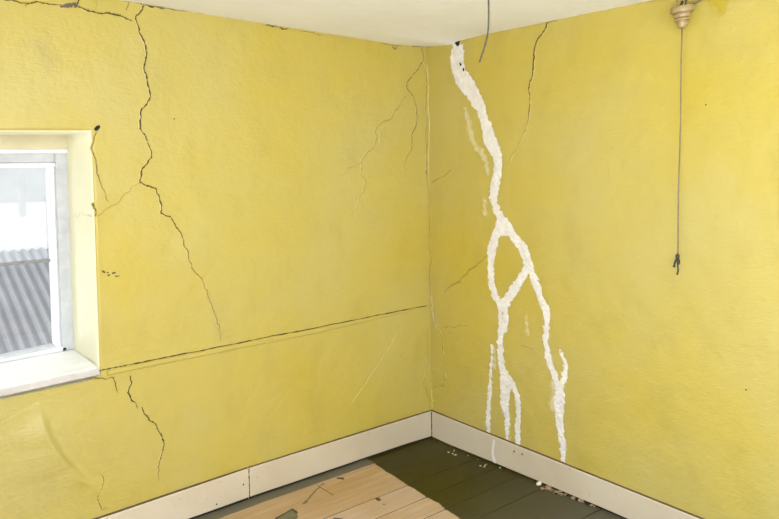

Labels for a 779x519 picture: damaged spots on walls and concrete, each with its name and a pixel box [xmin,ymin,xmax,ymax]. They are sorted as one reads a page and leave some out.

crack [2,0,486,481]
crack [461,20,558,173]